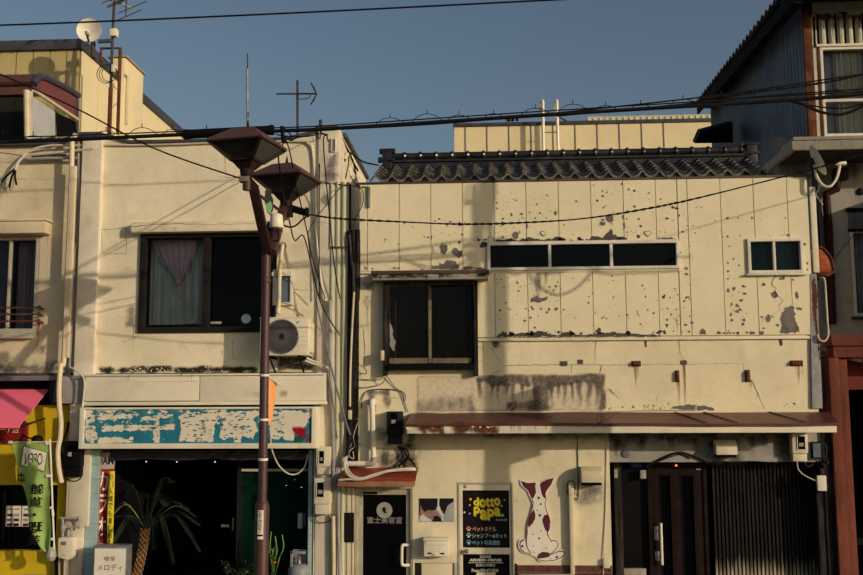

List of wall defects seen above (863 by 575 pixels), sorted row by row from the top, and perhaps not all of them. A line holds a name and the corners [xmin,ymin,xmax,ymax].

peeling [474,183,645,248]
peeling [364,218,487,278]
peeling [492,258,802,347]
damp [99,366,258,374]
damp [477,373,606,411]
damp [592,433,716,448]
damp [741,433,789,455]